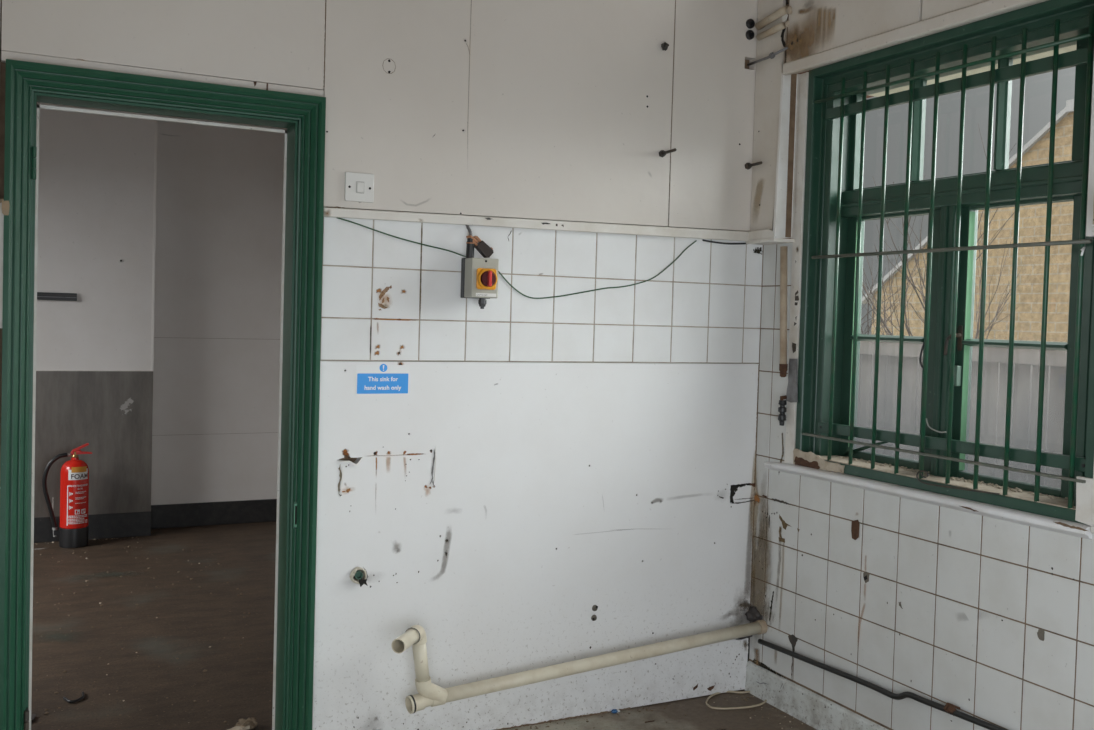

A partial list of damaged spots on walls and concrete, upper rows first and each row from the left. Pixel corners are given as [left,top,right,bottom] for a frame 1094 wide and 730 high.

flaking render [793,449,845,474]
spalling [730,483,756,504]